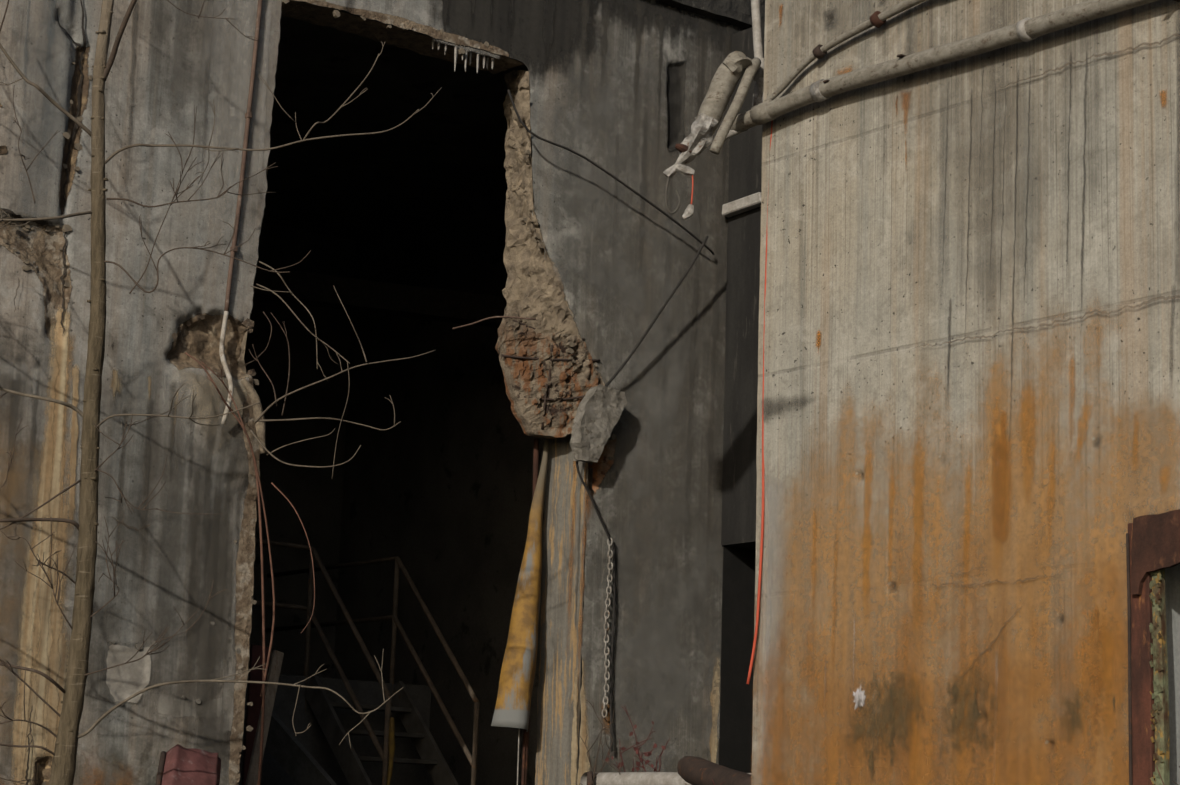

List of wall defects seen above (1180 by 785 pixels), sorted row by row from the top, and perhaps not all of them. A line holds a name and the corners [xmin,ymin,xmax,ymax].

spalling [0,46,92,341]
spalling [281,0,605,386]
crack [923,296,1180,346]
spalling [106,313,260,785]
rust [568,461,589,656]
rust [763,366,1180,785]